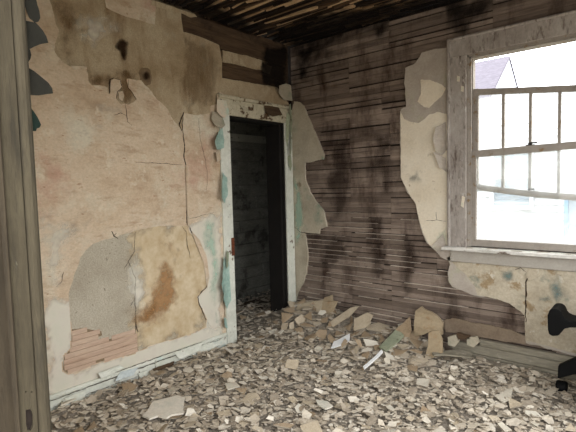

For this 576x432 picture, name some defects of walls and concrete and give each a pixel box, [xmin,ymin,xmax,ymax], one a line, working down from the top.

leakage [116,40,127,59]
flaking render [50,0,300,171]
crack [136,112,214,319]
crack [125,232,138,333]
flaking render [45,215,231,405]
leakage [125,226,206,355]
crack [515,267,528,321]